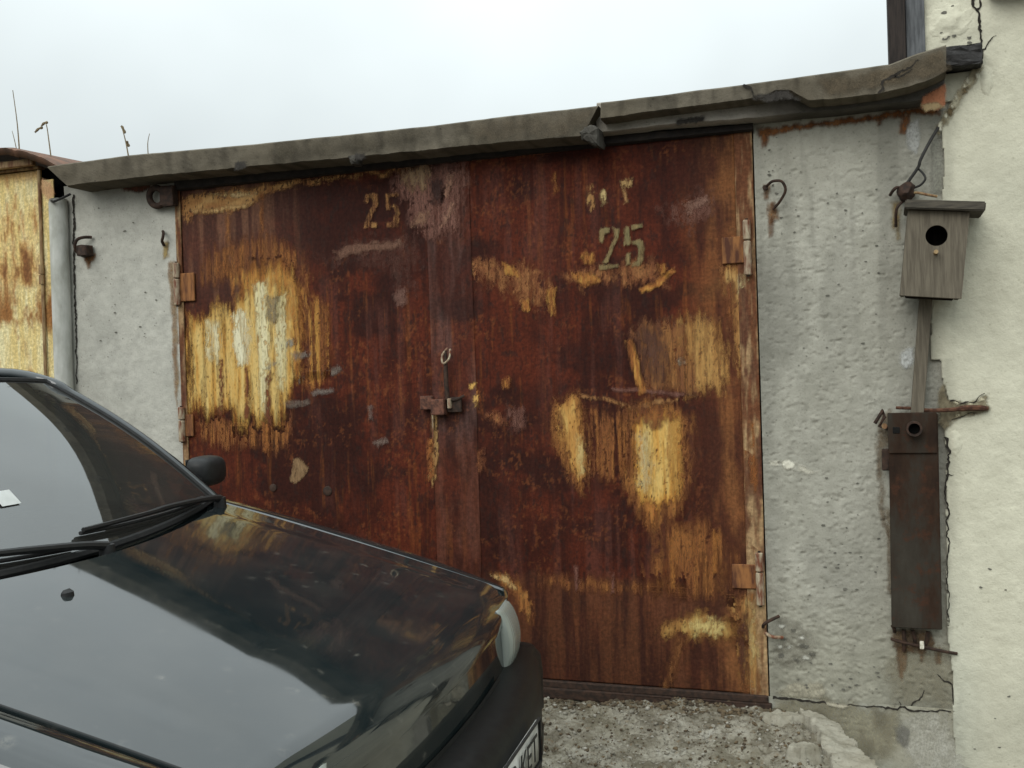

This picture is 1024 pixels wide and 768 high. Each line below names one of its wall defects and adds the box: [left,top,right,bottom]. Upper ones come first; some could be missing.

crack [878,59,919,93]
spalling [921,66,982,134]
rust [758,108,940,147]
rust [41,179,54,199]
rust [764,186,778,235]
rust [200,193,329,390]
rust [195,411,293,454]
rust [485,407,524,427]
rust [541,390,740,601]
rust [494,573,534,621]
crack [773,674,954,712]